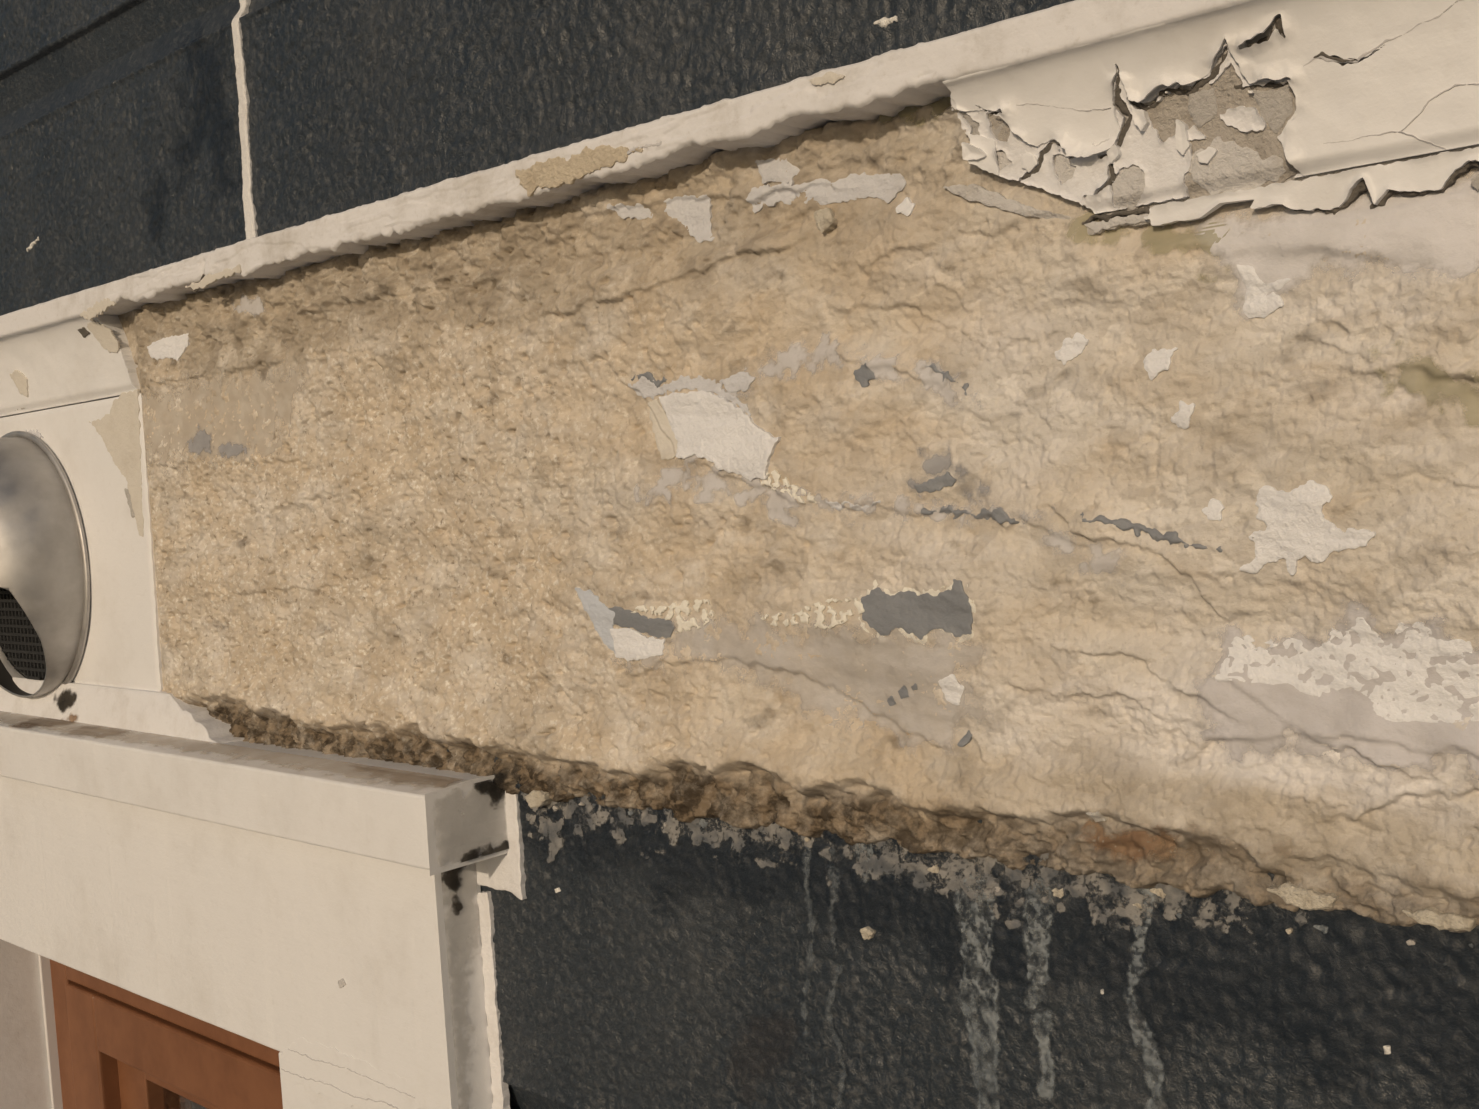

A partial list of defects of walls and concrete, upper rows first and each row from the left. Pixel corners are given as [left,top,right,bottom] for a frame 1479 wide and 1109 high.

crack [985,1,1479,225]
spalling [78,64,1479,933]
leakage [801,843,839,1035]
leakage [825,964,847,1109]
spalling [860,926,876,940]
leakage [955,875,1000,1109]
leakage [1023,878,1055,1099]
leakage [1126,886,1164,1109]